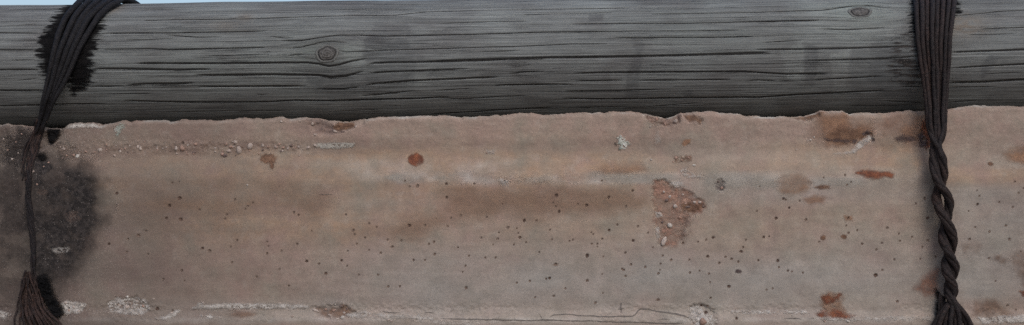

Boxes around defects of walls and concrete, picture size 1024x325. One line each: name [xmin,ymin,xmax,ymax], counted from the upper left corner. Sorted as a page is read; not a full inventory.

rust [408,153,423,166]
rust [856,170,893,179]
spalling [653,180,706,246]
rust [818,293,849,319]